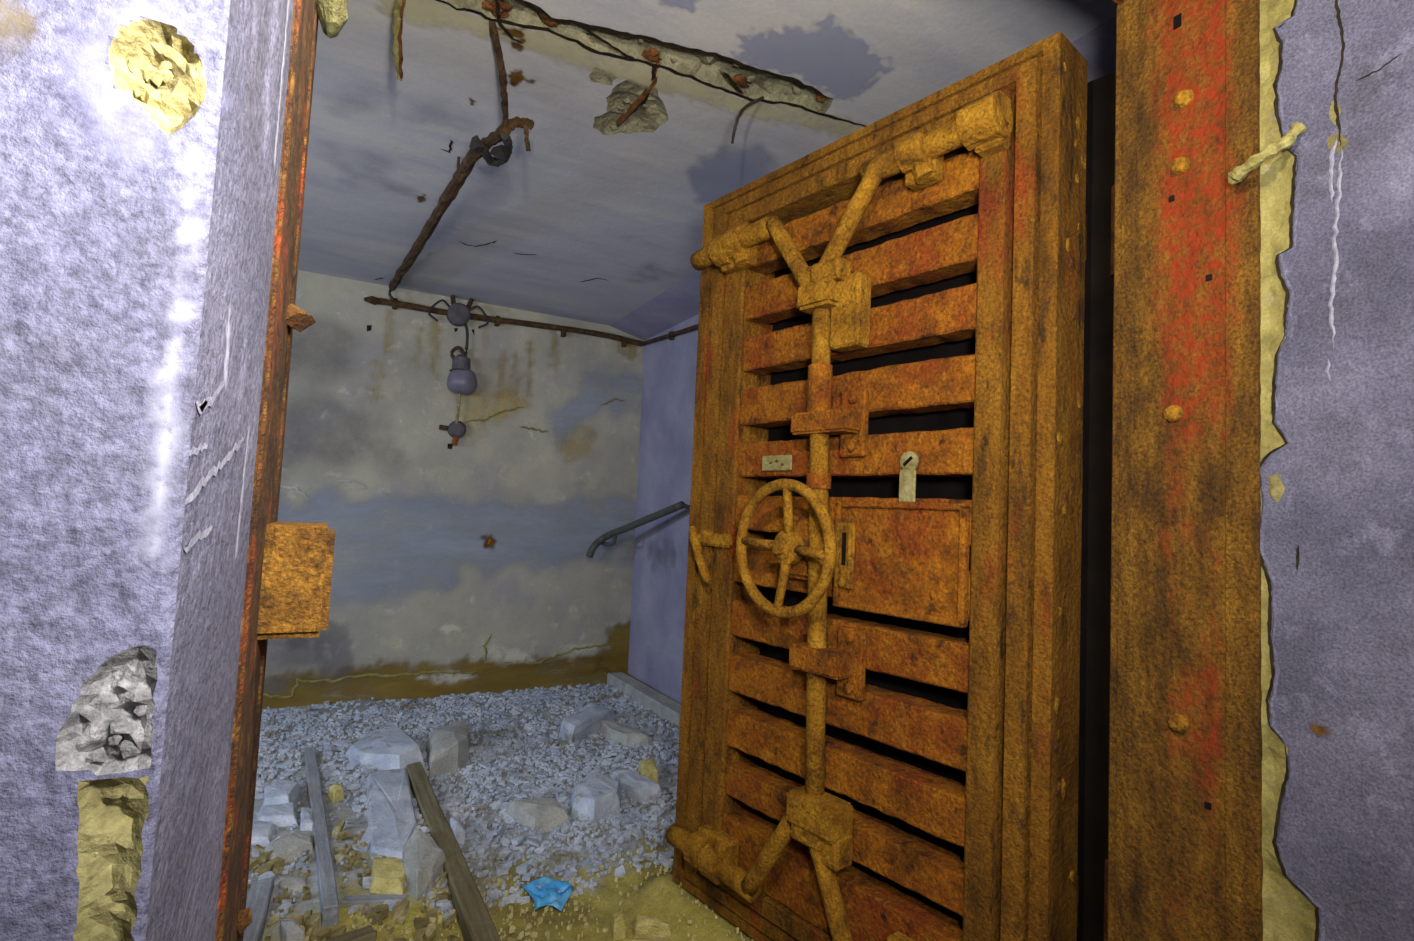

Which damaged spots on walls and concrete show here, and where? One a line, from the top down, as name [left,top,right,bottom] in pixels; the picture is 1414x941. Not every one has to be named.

spalling [82,7,207,136]
spalling [588,62,668,135]
peeling [739,16,889,99]
crack [1325,0,1401,381]
spalling [1259,0,1325,941]
damp [262,621,630,709]
spalling [55,645,157,941]